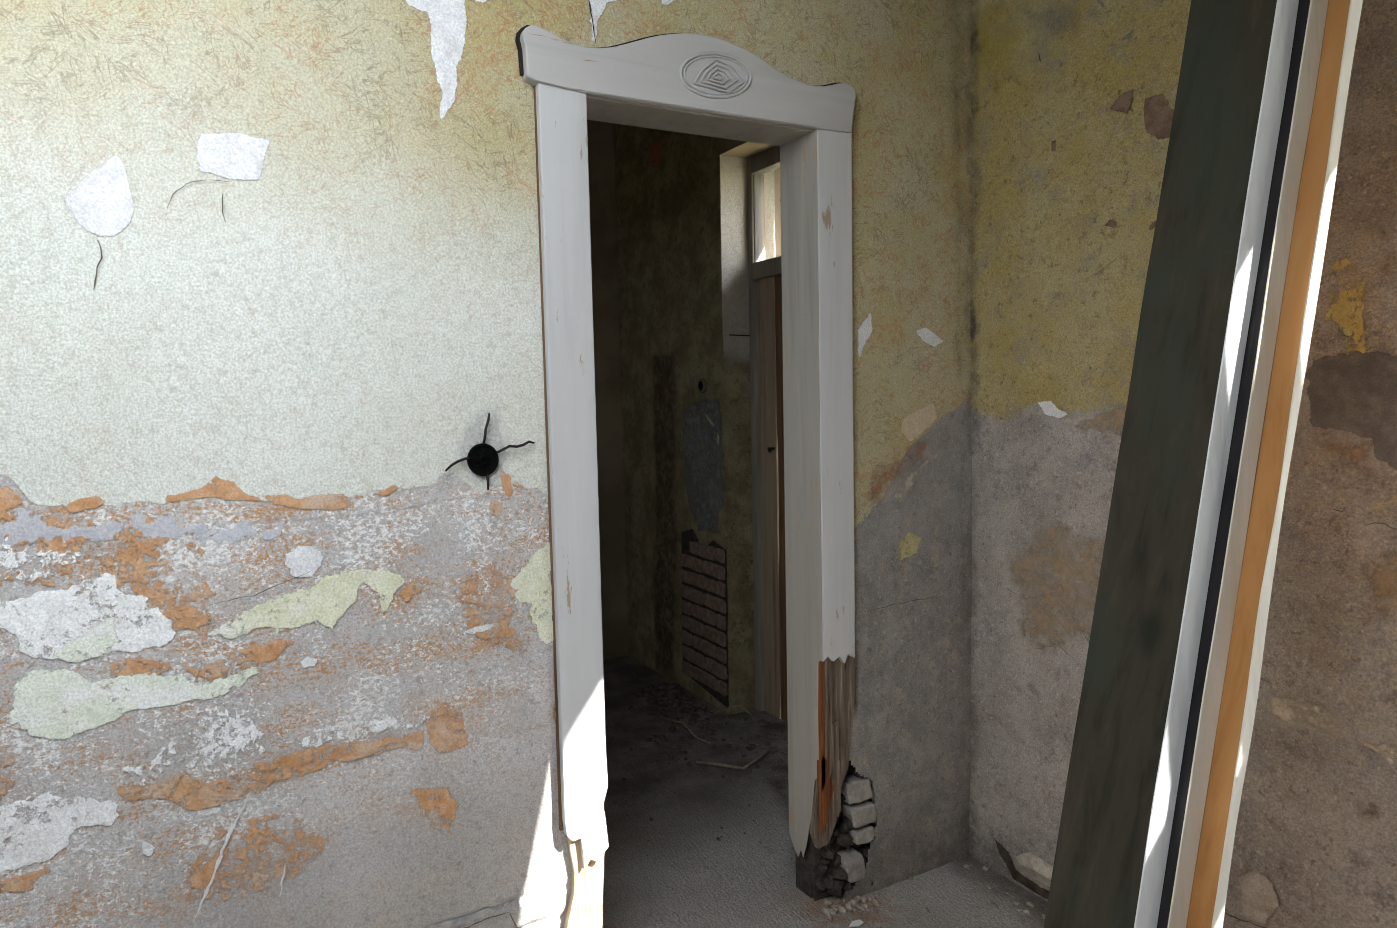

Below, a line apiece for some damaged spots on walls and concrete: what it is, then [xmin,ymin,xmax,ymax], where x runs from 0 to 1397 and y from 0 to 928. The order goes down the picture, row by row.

peeling [406,0,486,120]
peeling [588,0,617,42]
peeling [64,155,134,237]
peeling [196,132,270,180]
spalling [1305,258,1397,470]
peeling [447,542,553,656]
peeling [0,476,468,892]
spalling [185,811,331,907]
spalling [424,899,529,928]